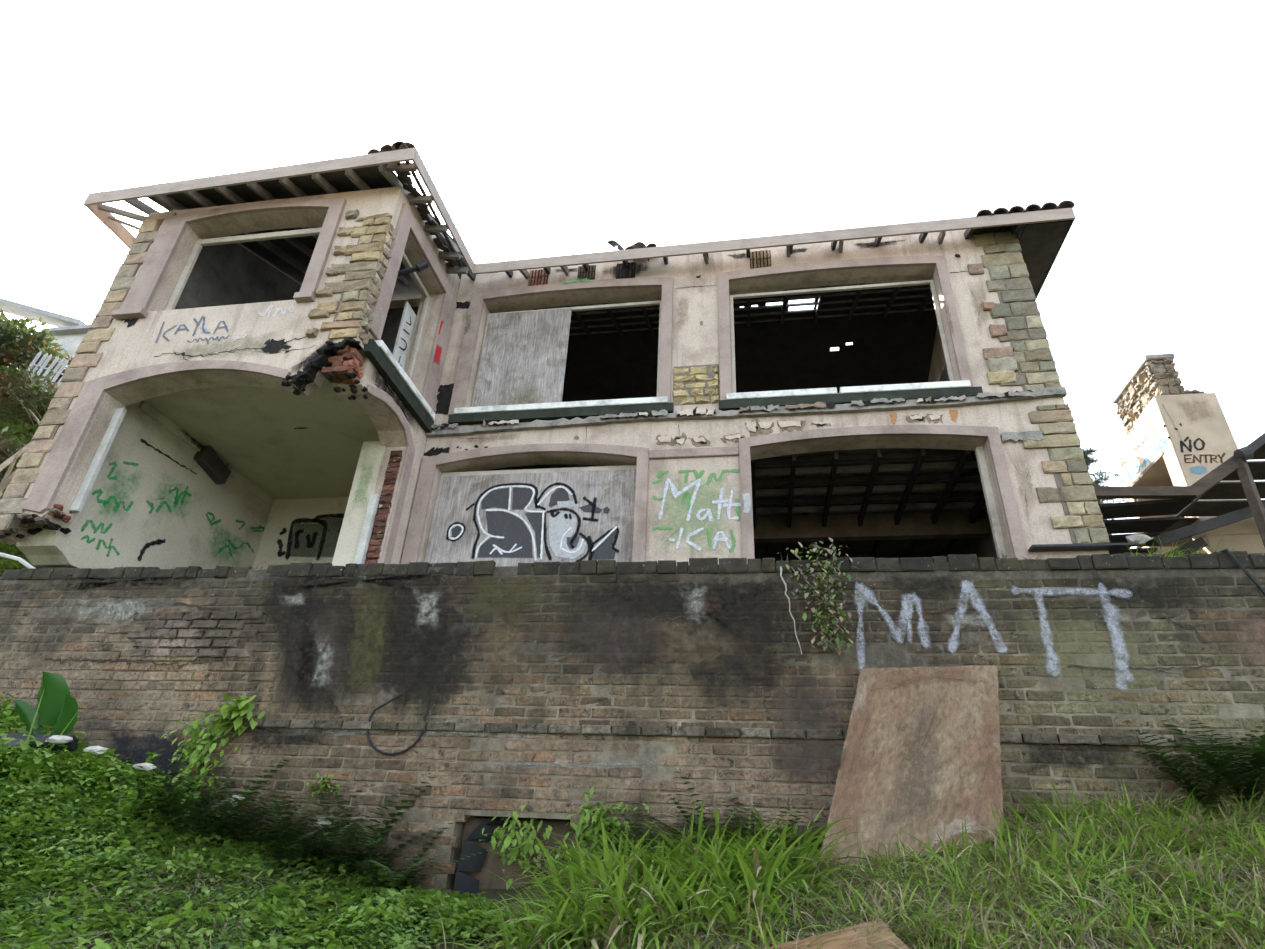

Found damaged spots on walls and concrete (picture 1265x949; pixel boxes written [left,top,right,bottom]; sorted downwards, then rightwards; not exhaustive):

crack [154,336,315,360]
spalling [281,337,368,400]
peeling [481,418,519,427]
spalling [600,364,720,420]
peeling [655,402,835,447]
peeling [851,390,1036,424]